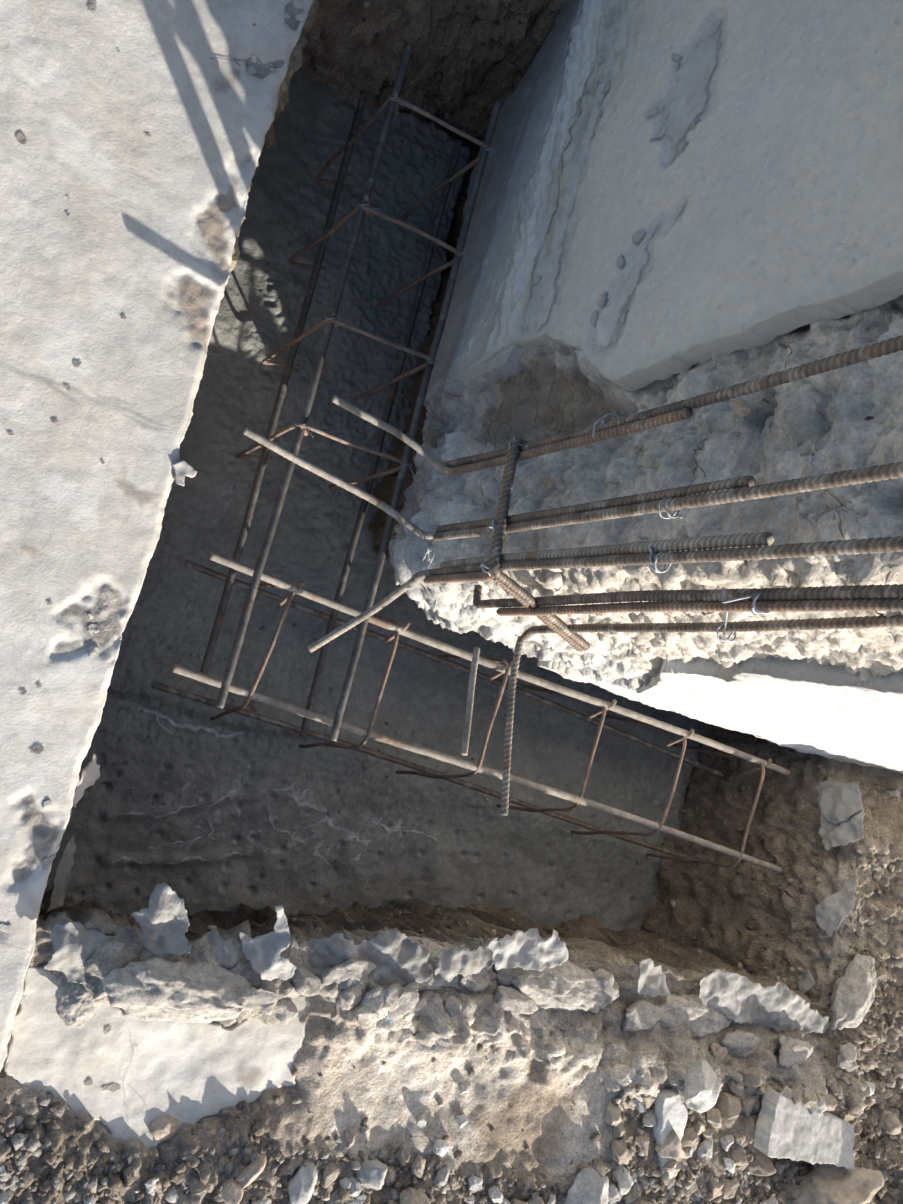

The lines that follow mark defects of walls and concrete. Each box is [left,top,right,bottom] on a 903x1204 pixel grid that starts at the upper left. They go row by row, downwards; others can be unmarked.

peeling [590,223,658,349]